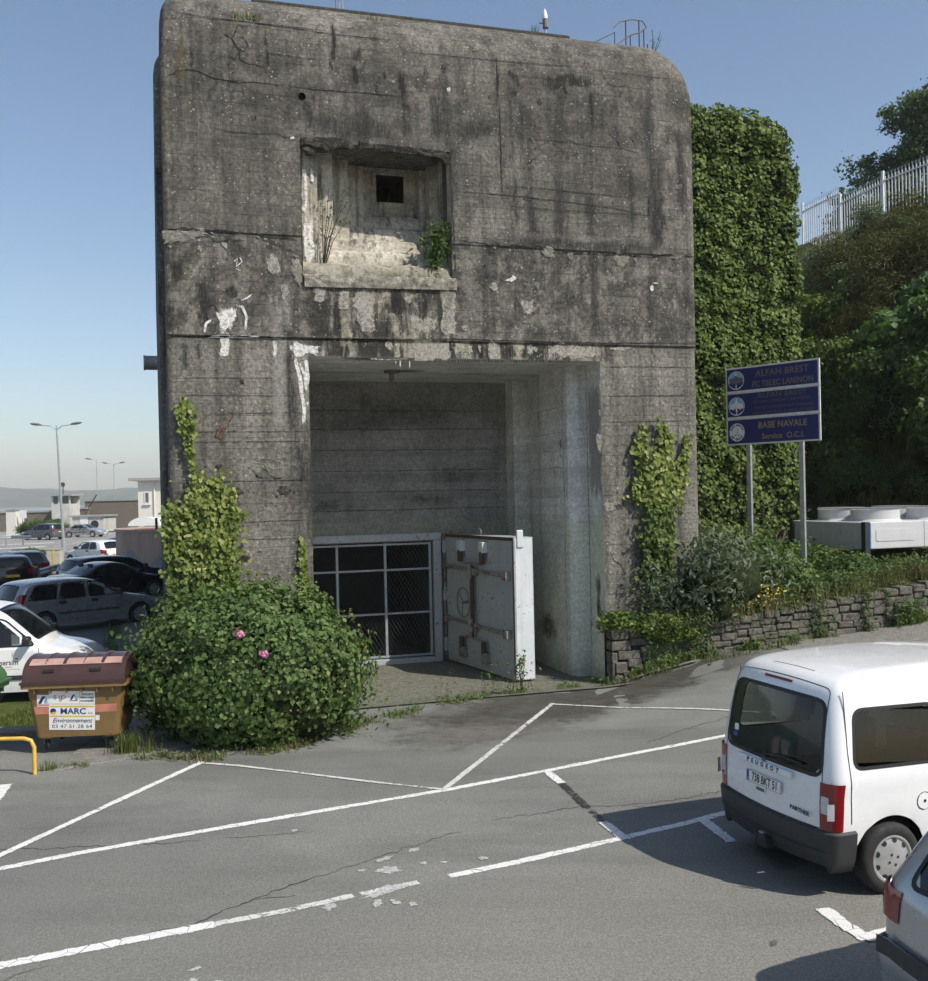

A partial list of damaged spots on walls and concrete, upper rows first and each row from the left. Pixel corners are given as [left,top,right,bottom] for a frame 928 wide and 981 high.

crack [167,21,397,101]
water stain [543,72,594,124]
water stain [514,163,666,320]
water stain [196,283,258,357]
water stain [273,287,320,423]
water stain [384,296,428,334]
water stain [341,345,569,373]
rust [445,534,516,681]